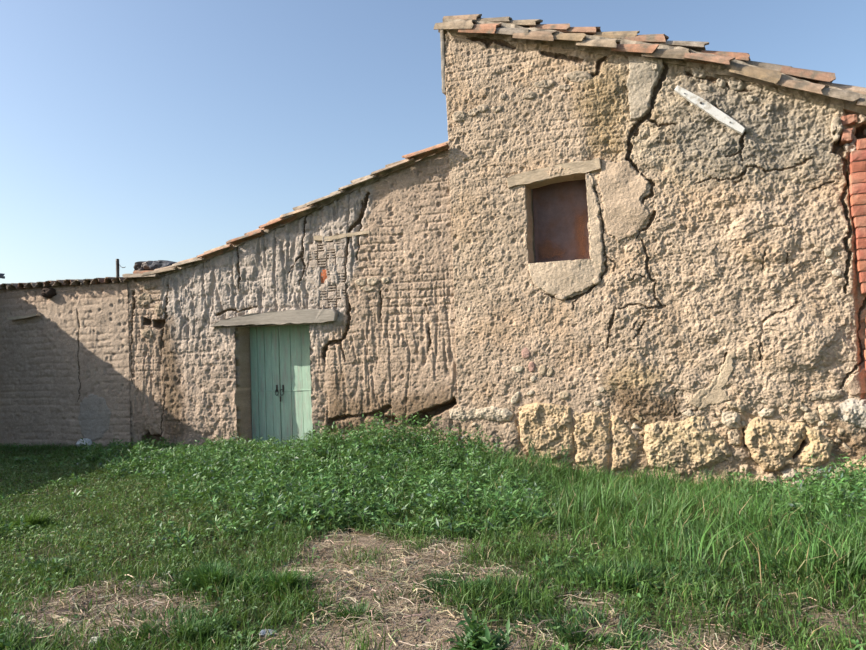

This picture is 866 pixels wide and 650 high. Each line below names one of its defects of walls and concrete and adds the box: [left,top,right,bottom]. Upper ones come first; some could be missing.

crack [694,132,812,185]
crack [347,192,370,261]
crack [545,63,676,349]
crack [812,153,866,389]
crack [322,279,352,363]